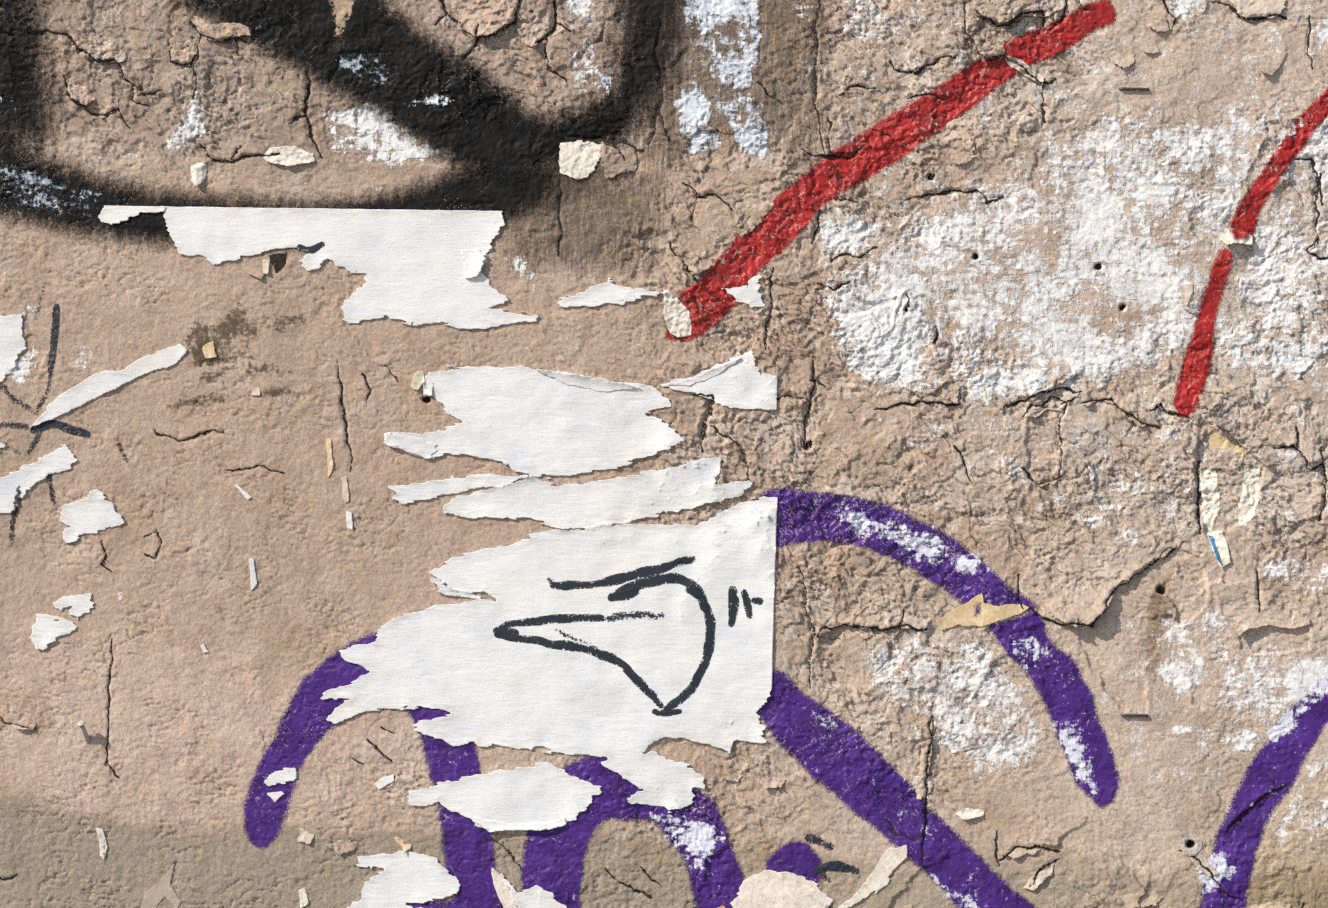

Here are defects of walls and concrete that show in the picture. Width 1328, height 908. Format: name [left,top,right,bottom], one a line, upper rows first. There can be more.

crack [0,20,246,129]
peeling [335,54,387,84]
peeling [448,0,550,48]
crack [435,0,571,82]
peeling [563,0,611,93]
crack [801,0,1097,291]
peeling [734,192,775,238]
crack [1294,158,1328,260]
peeling [663,289,692,337]
crack [1003,387,1190,485]
peeling [1198,395,1324,568]
crack [1017,460,1201,628]